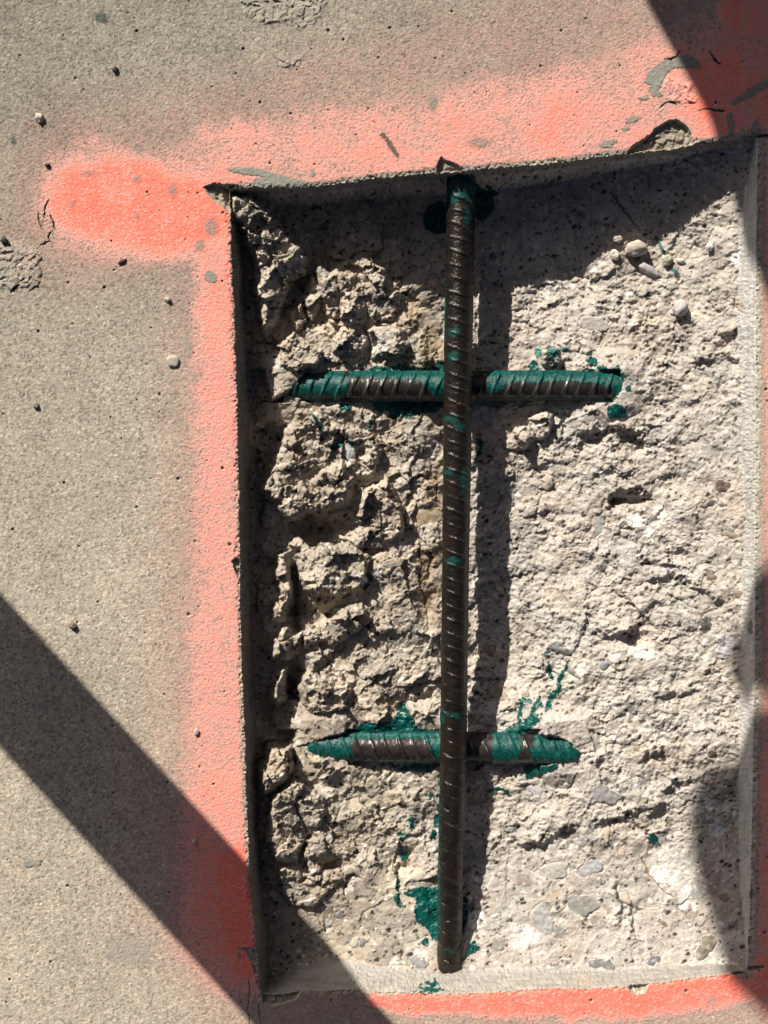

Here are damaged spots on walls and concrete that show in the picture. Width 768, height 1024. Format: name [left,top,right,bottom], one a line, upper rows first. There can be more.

spalling [203,78,768,1006]